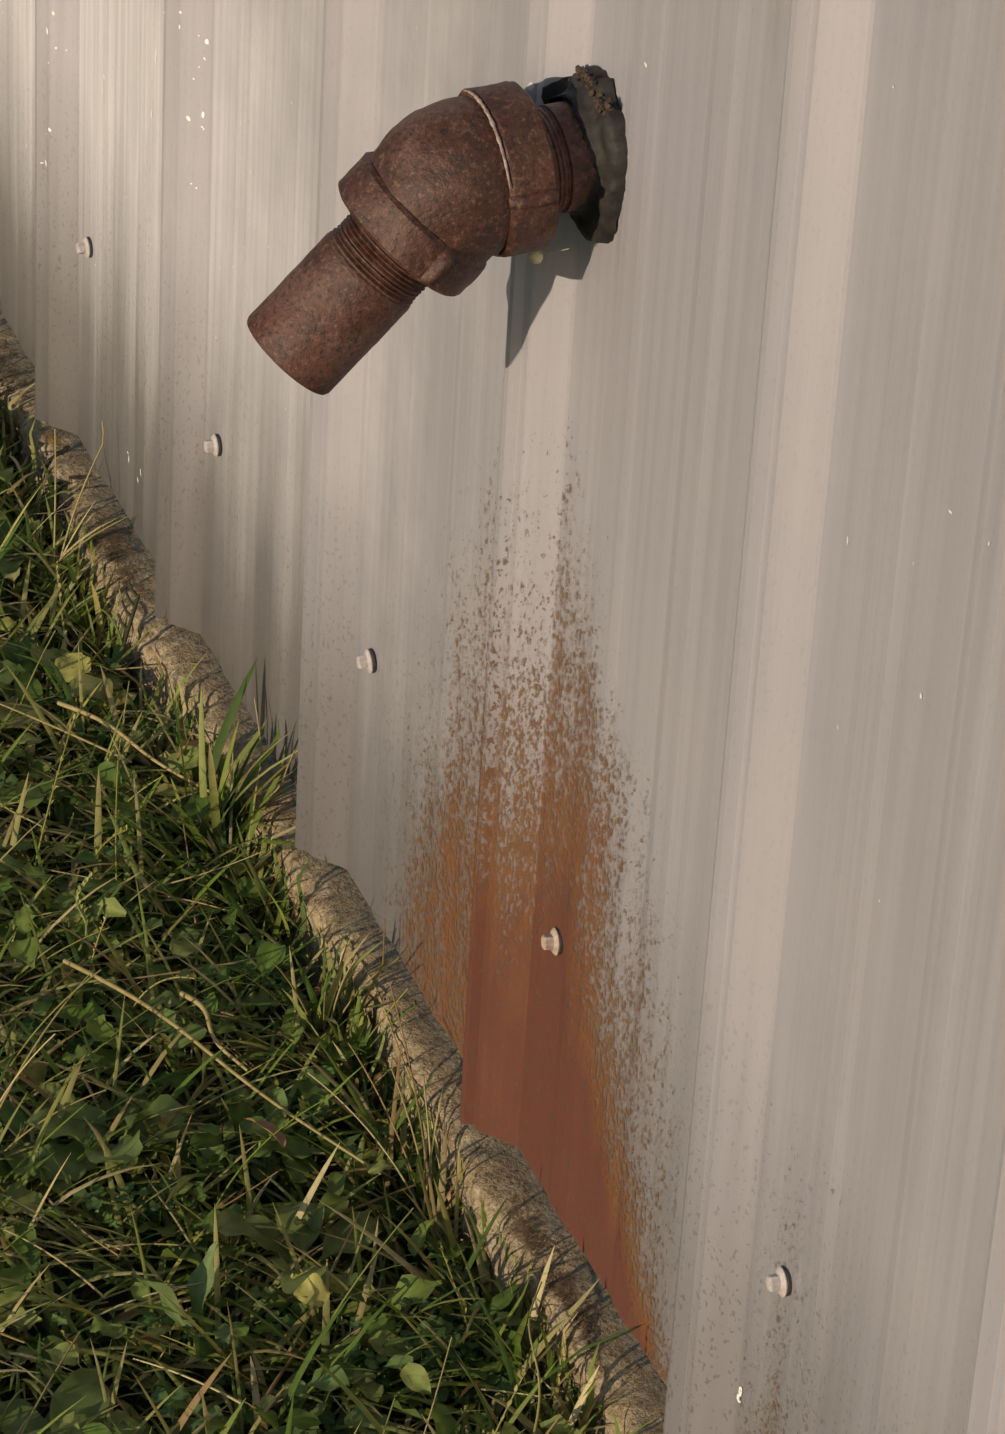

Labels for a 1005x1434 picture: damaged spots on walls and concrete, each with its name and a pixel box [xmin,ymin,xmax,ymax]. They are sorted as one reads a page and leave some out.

rust [376,418,698,1387]